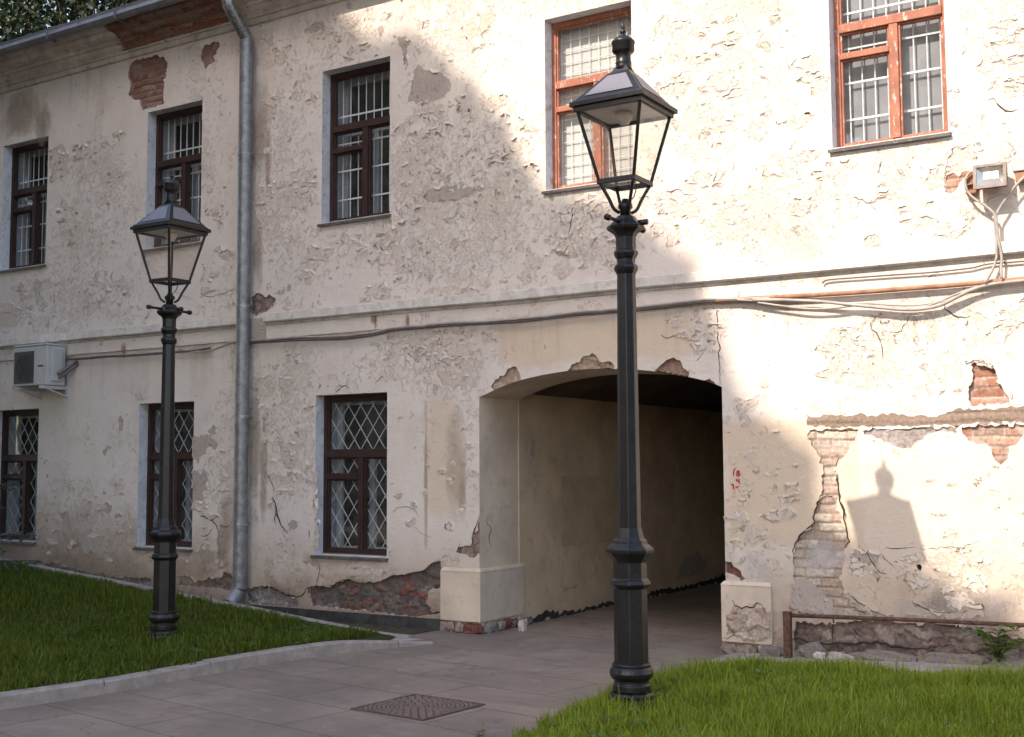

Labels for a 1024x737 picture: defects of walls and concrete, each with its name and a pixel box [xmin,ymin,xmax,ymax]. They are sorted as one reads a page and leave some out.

flaking render [127,54,168,110]
peeling [297,9,543,303]
peeling [869,143,982,241]
peeling [514,191,616,284]
flaking render [250,282,292,316]
flaking render [571,354,615,370]
flaking render [657,358,689,376]
crack [661,310,720,378]
flaking render [965,356,1012,408]
crack [263,470,287,533]
flaking render [723,421,1024,661]
flaking render [310,561,441,617]